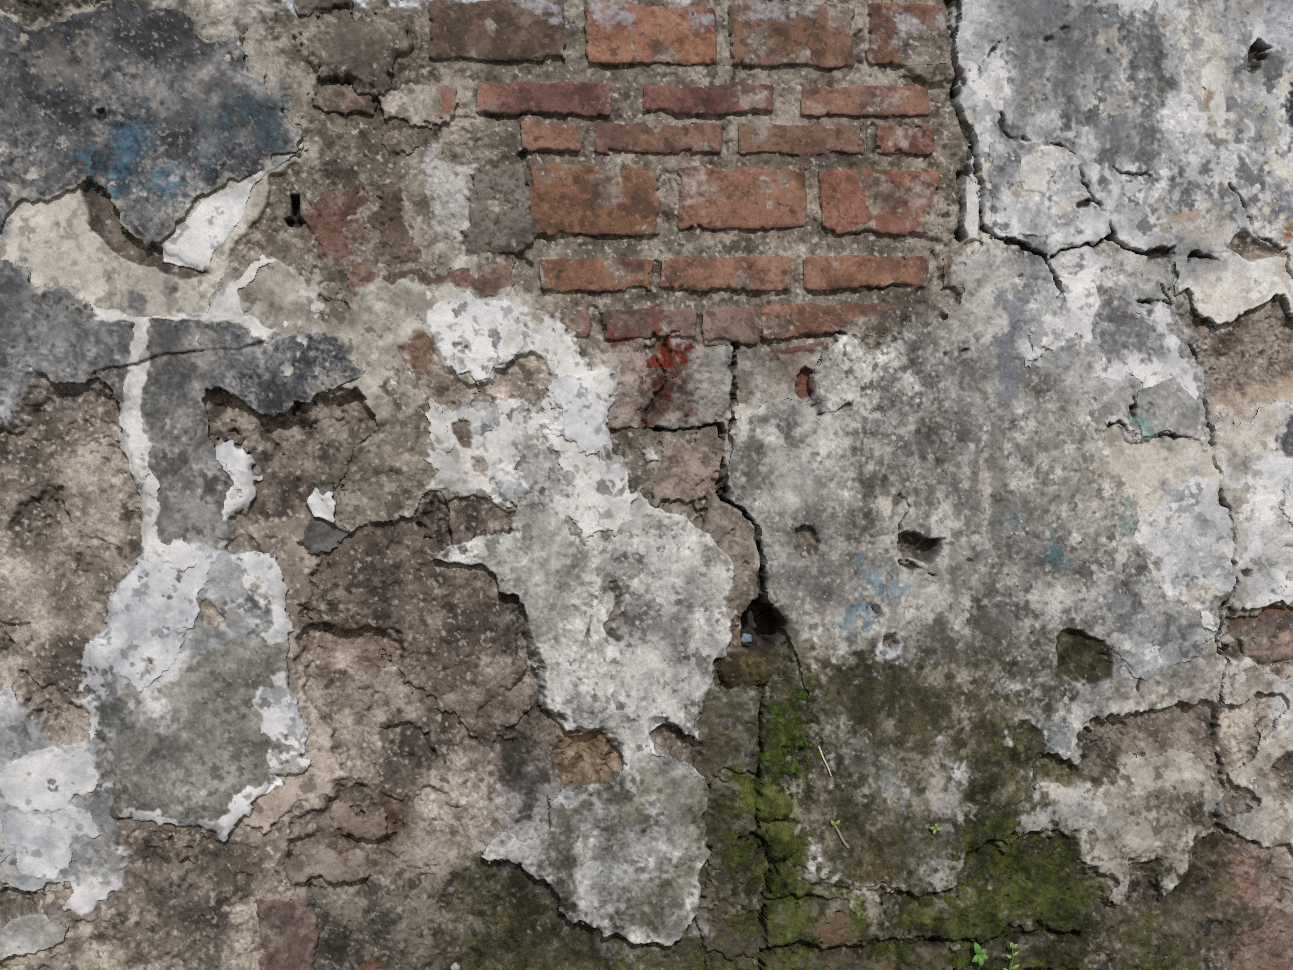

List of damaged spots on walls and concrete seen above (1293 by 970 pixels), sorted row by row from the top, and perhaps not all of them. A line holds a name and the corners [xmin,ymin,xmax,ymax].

crack [89,341,271,378]
spalling [0,0,983,970]
crack [643,342,768,604]
crack [818,402,856,417]
crack [943,0,1239,794]
crack [1228,182,1293,278]
spalling [944,295,1293,970]